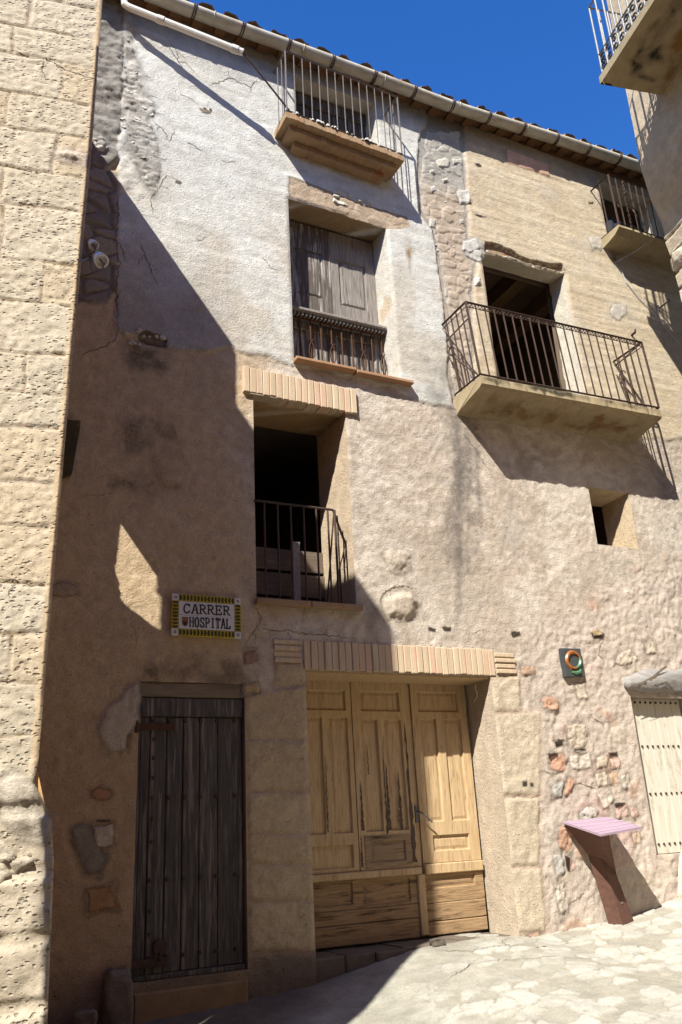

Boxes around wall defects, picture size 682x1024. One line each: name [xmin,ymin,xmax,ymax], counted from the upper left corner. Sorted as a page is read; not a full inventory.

flaking render [93,136,109,152]
flaking render [118,26,161,195]
crack [81,197,157,356]
flaking render [418,131,488,398]
crack [246,604,352,645]